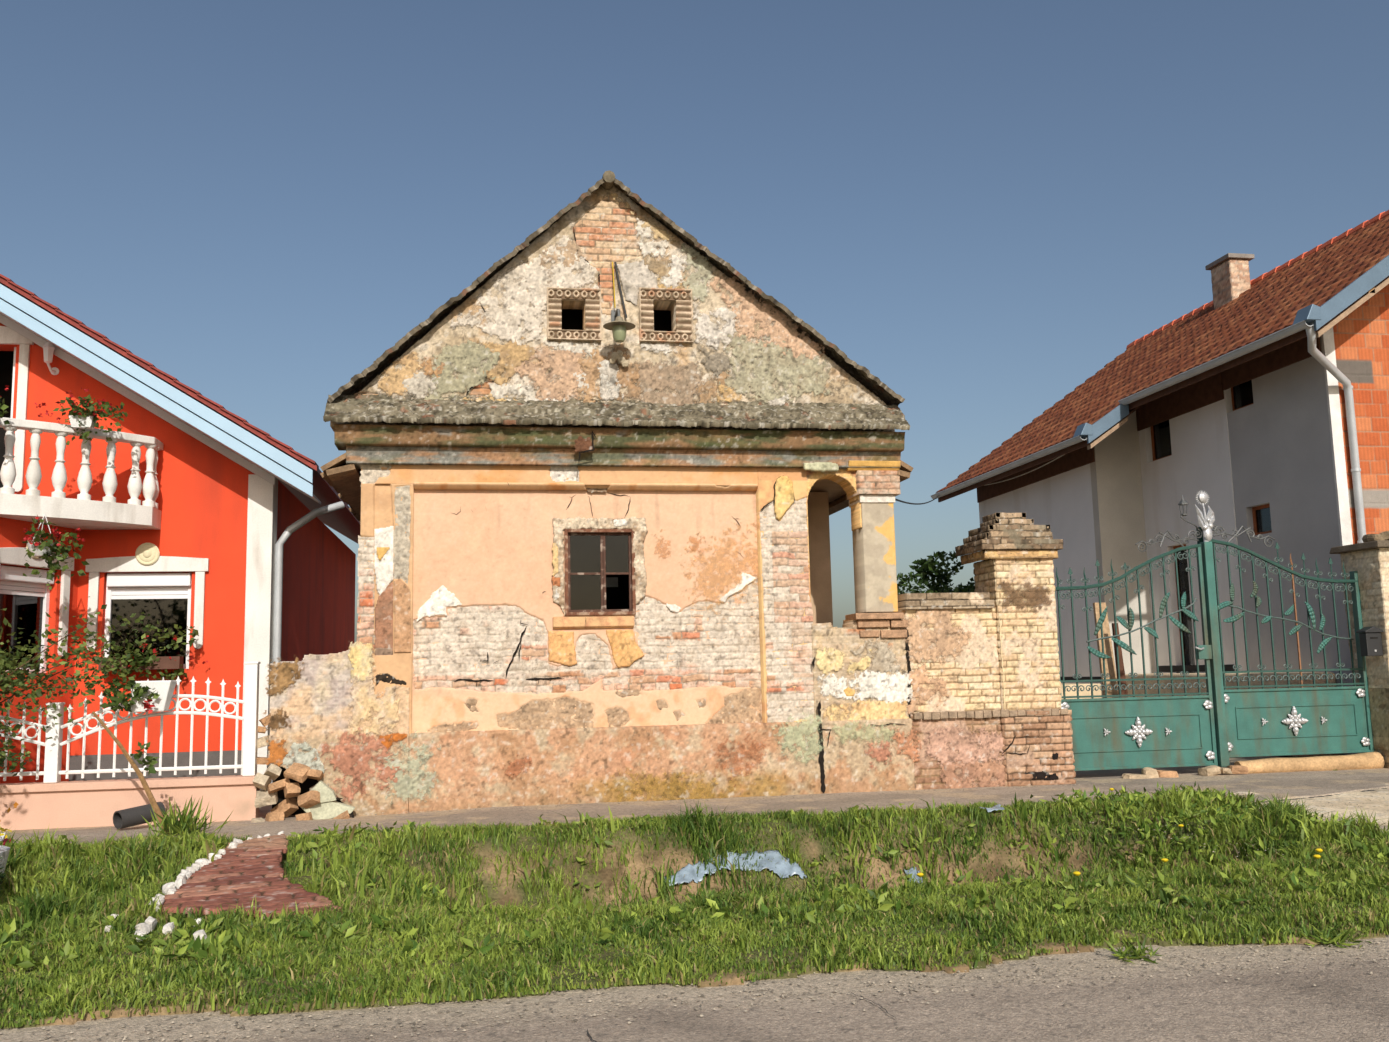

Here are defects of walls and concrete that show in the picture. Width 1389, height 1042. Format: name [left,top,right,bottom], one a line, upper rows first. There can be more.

peeling [353,193,834,406]
flaking render [348,465,913,735]